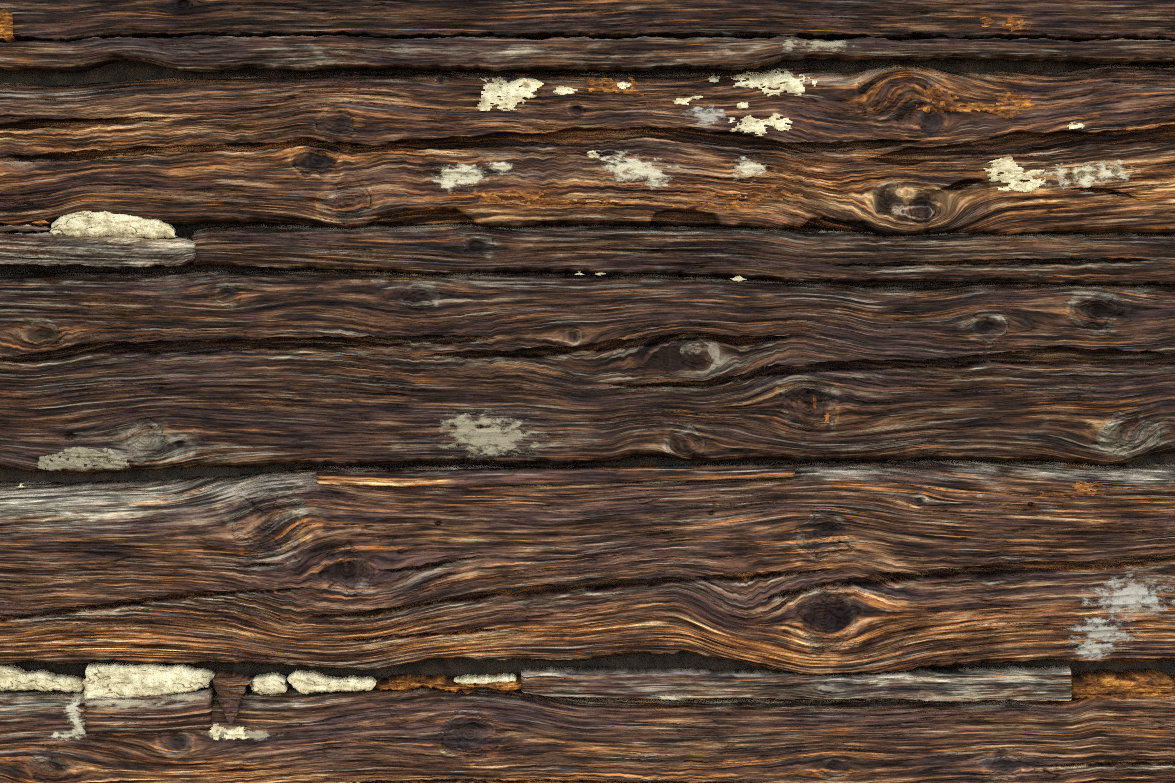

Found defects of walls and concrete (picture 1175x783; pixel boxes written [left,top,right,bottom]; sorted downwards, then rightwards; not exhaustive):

efflorescence [691,105,725,125]
damp [1041,160,1128,189]